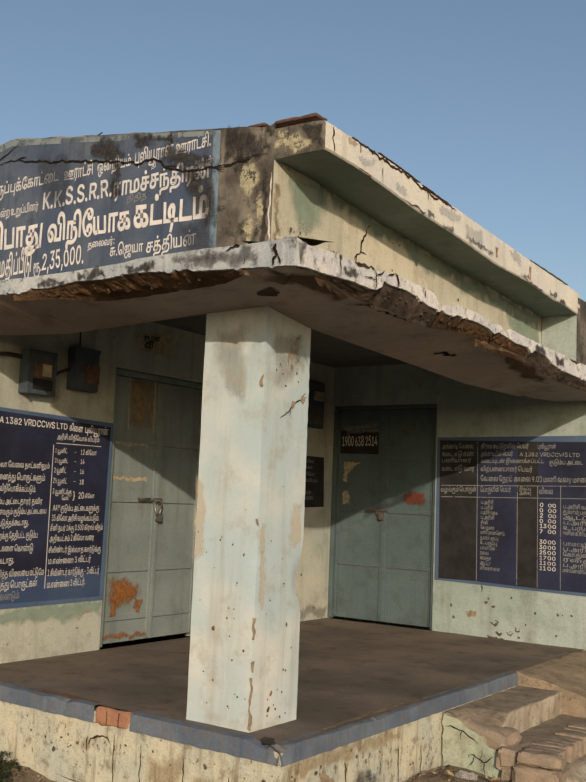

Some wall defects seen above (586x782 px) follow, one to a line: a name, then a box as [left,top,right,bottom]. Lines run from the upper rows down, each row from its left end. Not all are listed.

crack [0,143,269,172]
leakage [135,128,280,267]
crack [332,127,455,209]
spalling [257,288,280,296]
leakage [267,271,347,300]
crack [340,226,407,321]
leakage [290,180,546,355]
spalling [369,283,586,390]
crack [86,733,115,782]
flaking render [95,706,134,729]
peeling [314,765,337,782]
crack [443,713,492,773]